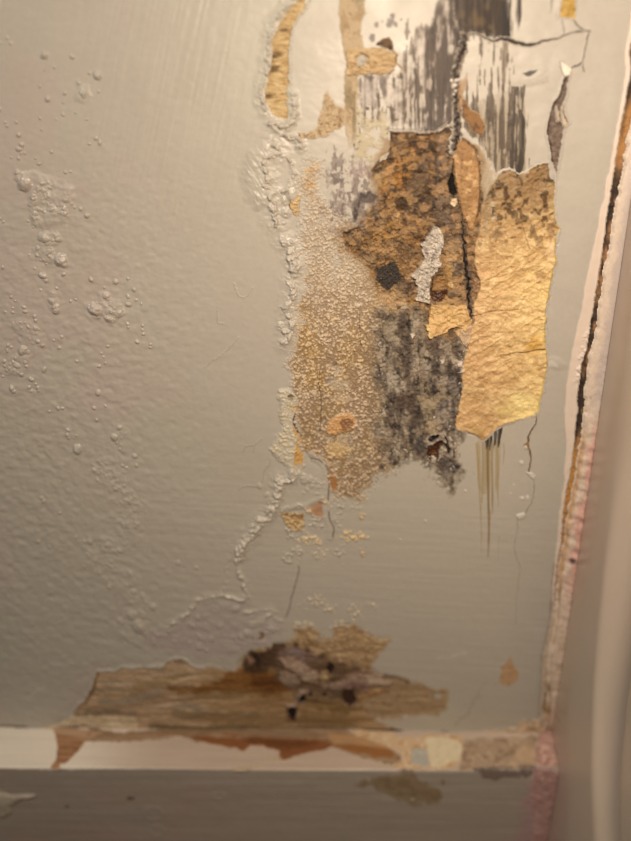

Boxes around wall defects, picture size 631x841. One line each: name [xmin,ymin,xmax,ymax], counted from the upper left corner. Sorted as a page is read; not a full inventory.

peeling [265,0,311,122]
flaking render [345,47,403,76]
peeling [557,0,579,21]
spalling [448,173,457,195]
water stain [280,0,536,567]
peeling [409,225,454,304]
peeling [456,59,573,443]
peeling [267,387,306,471]
spalling [474,13,631,734]
crack [539,50,631,729]
peeling [280,496,330,532]
peeling [45,636,539,772]